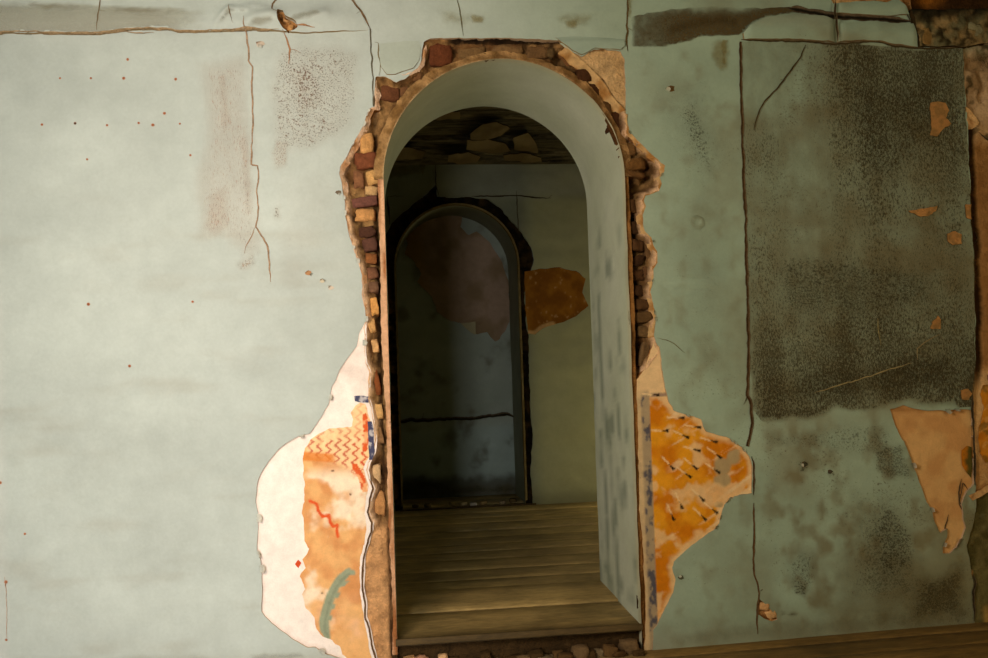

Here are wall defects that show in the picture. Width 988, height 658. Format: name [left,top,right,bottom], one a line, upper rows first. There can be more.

crack [352,0,381,106]
water stain [635,7,806,46]
spalling [831,0,988,49]
crack [0,0,312,282]
water stain [744,44,976,420]
flaking render [256,39,751,658]
crack [739,0,957,634]
peeling [890,389,973,553]
crack [970,574,978,621]